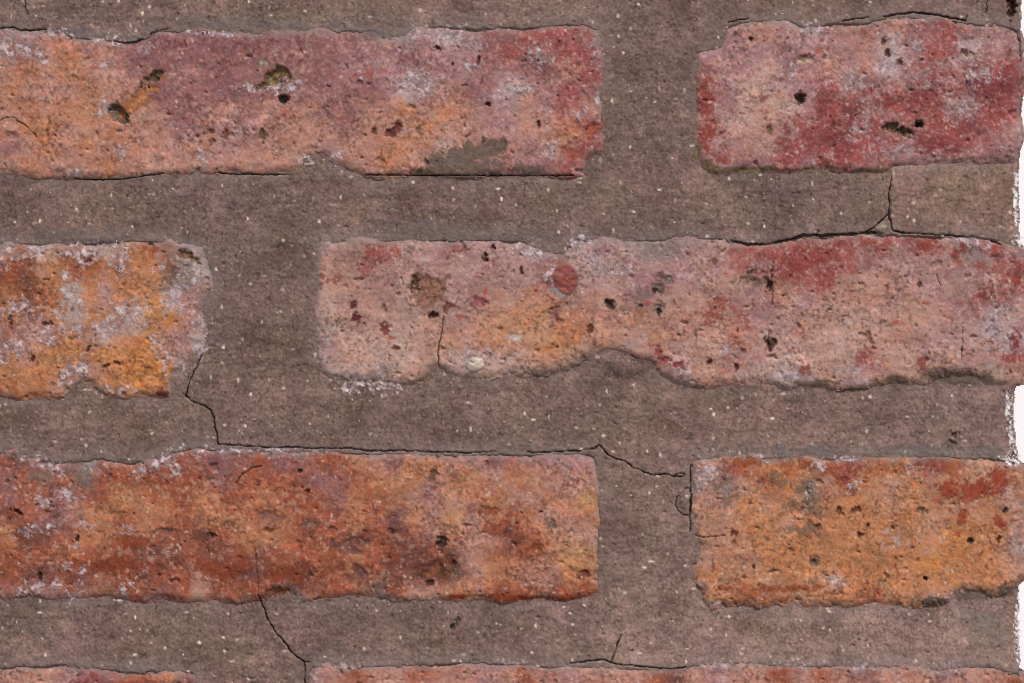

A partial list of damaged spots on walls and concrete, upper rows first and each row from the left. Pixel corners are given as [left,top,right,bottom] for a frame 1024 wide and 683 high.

crack [734,177,963,296]
crack [186,355,492,480]
crack [528,445,722,537]
crack [259,596,306,683]
crack [572,637,685,669]